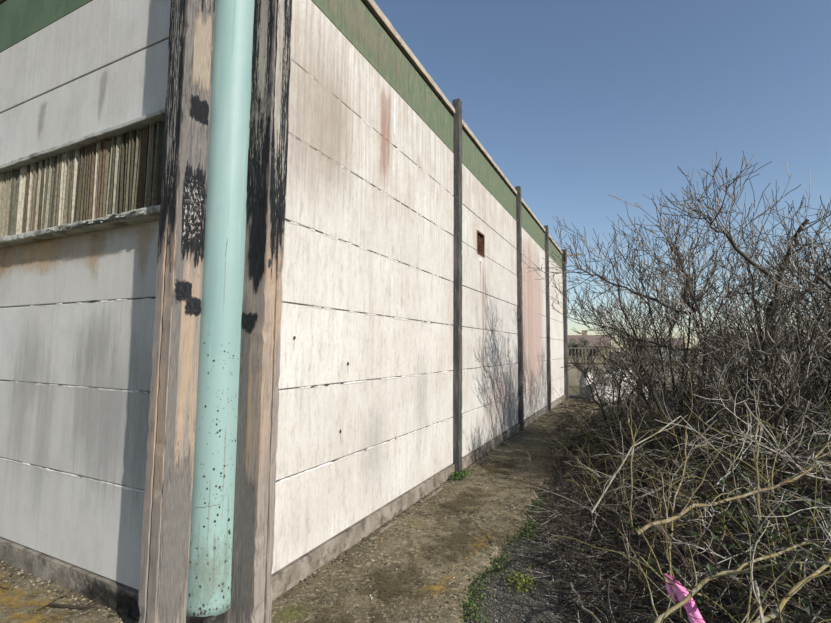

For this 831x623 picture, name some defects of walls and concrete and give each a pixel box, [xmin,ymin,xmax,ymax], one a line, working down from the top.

corrosion [1,239,63,268]